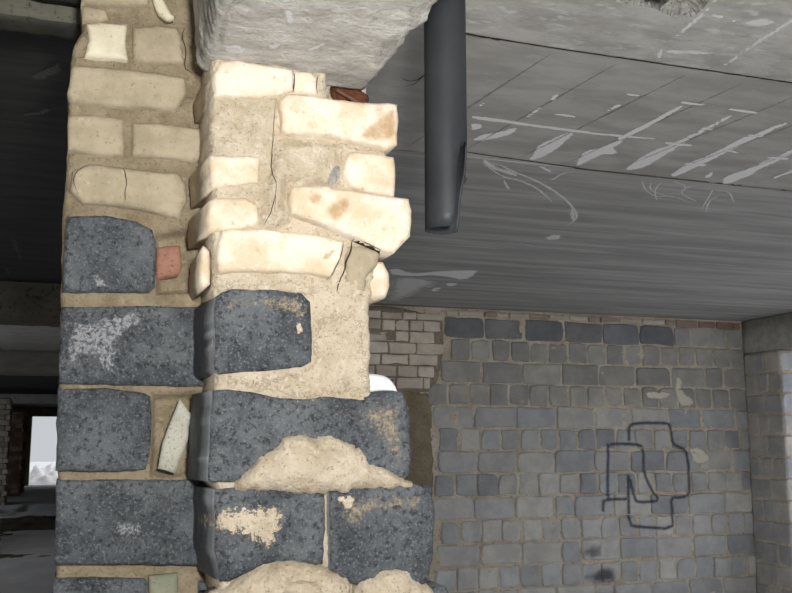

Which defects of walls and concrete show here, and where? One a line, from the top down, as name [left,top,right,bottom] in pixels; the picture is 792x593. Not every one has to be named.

spalling [613,0,711,19]
corrosion [330,87,369,103]
crack [264,104,277,225]
crack [332,239,381,290]